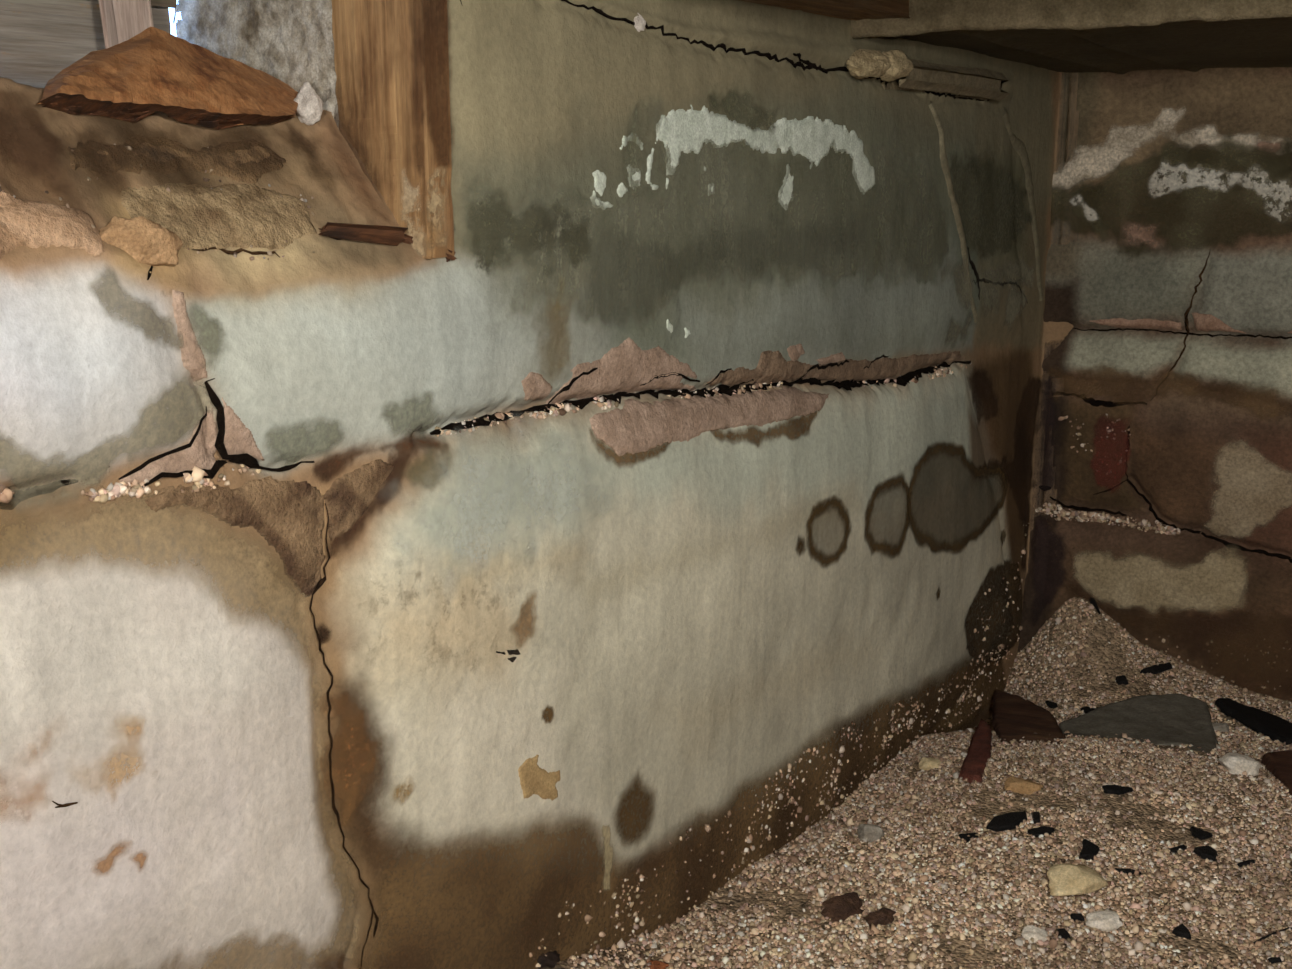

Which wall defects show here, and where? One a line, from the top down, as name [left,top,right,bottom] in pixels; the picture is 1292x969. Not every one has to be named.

crack [561,0,883,83]
peeling [590,105,875,210]
leakage [469,92,1033,317]
leakage [1050,136,1292,255]
spalling [172,290,207,382]
leakage [192,307,222,356]
peeling [666,319,691,338]
crack [430,354,971,435]
spalling [521,338,966,456]
crack [1039,252,1292,563]
leakage [0,367,1292,969]
crack [309,503,379,969]